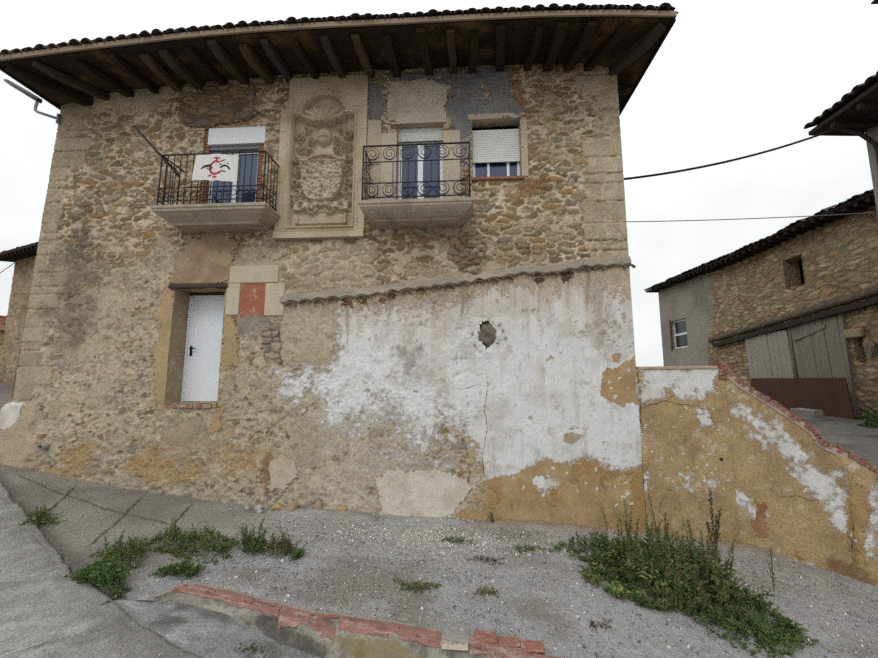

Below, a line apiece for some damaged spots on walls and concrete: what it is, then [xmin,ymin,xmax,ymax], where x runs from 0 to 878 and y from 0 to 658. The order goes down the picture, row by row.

peeling [0,401,25,431]
peeling [270,271,722,529]
crack [637,369,715,429]
flaking render [672,445,770,538]
peeling [728,403,878,557]